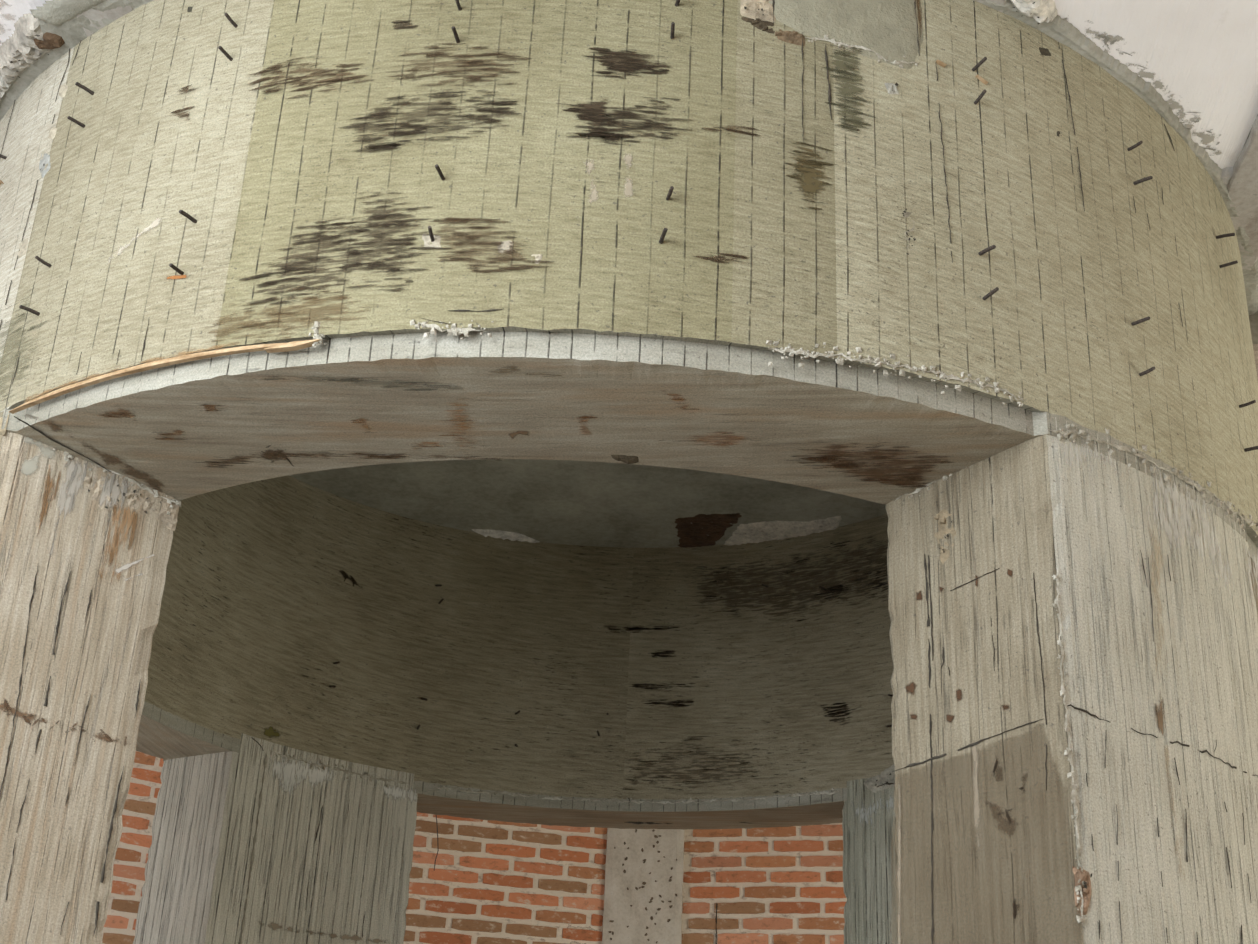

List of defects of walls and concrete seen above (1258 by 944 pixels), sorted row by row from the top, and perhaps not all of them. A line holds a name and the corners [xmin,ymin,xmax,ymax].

spalling [740,0,842,49]
leakage [249,57,367,99]
leakage [343,43,530,152]
leakage [557,97,689,145]
leakage [586,47,670,79]
leakage [702,125,759,136]
leakage [823,45,876,137]
leakage [784,142,836,210]
leakage [239,192,554,328]
leakage [694,253,747,263]
leakage [693,537,888,621]
crack [877,550,1258,944]